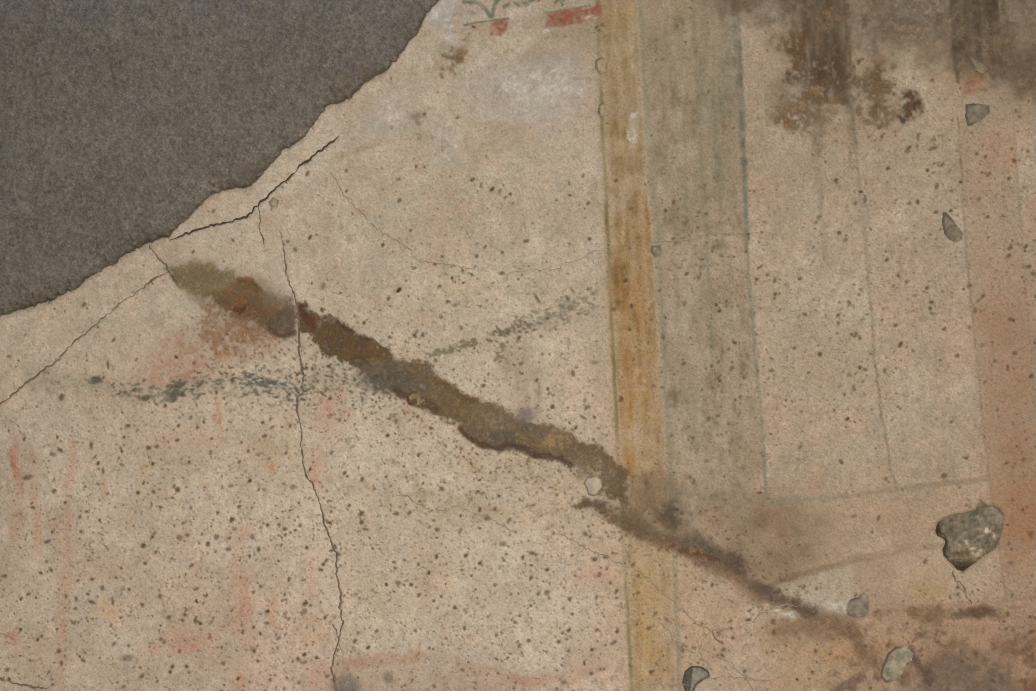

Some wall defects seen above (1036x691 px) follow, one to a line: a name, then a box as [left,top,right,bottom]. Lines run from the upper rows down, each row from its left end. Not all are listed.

leakage [731,0,1036,101]
crack [335,178,761,275]
crack [0,136,344,691]
leakage [170,261,863,654]
crack [396,494,519,535]